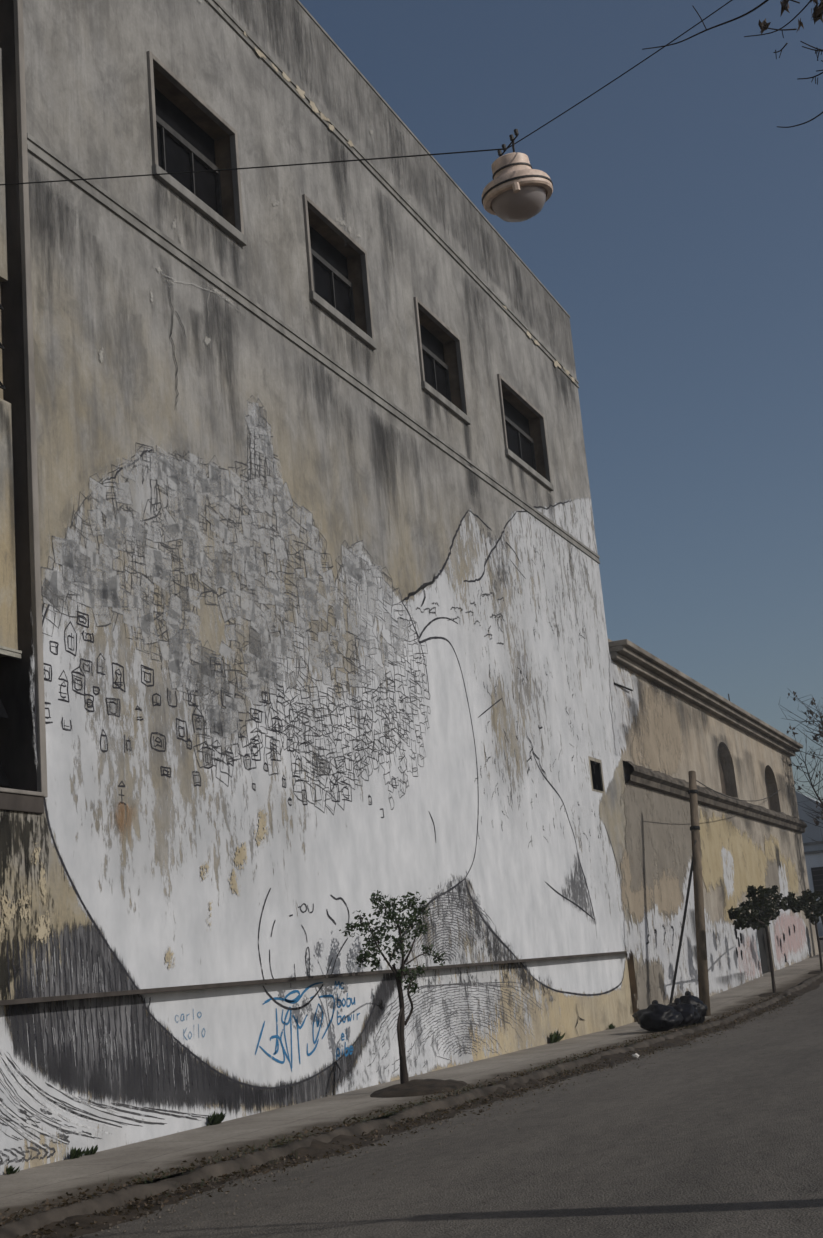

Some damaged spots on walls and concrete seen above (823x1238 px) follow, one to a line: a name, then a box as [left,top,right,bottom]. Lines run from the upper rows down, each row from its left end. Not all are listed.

water stain [464,422,474,491]
flaking render [609,655,682,777]
peeling [0,843,53,943]
peeling [229,810,268,896]
peeling [620,777,812,1010]